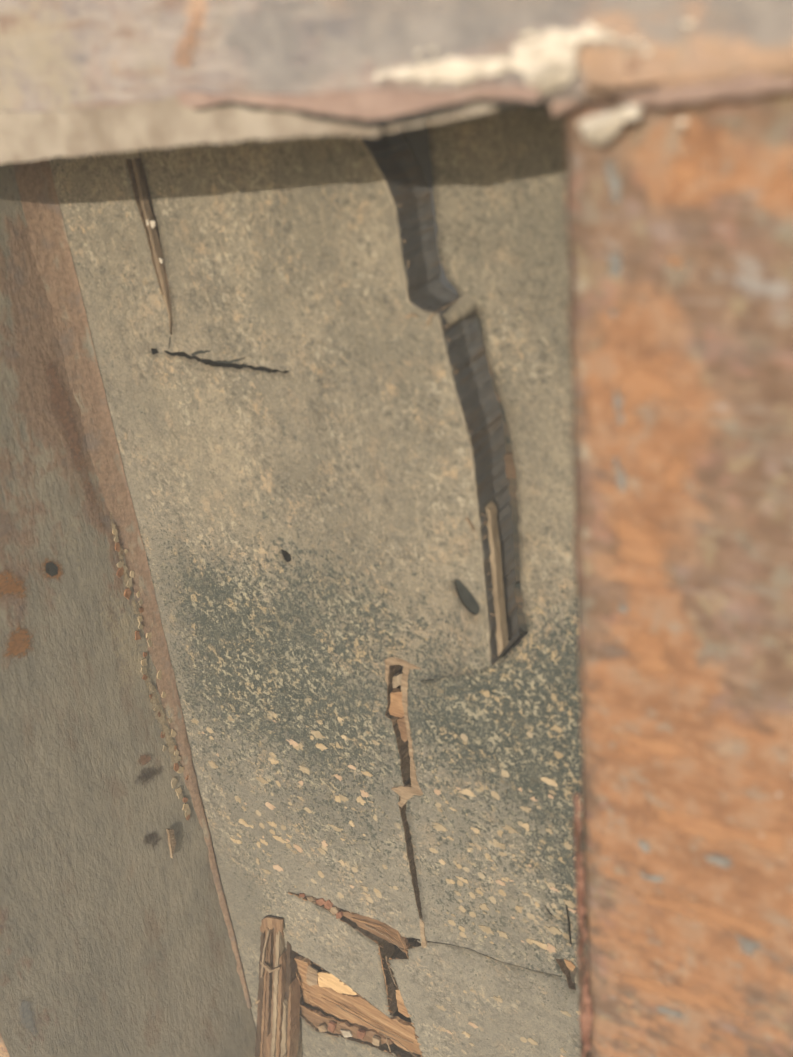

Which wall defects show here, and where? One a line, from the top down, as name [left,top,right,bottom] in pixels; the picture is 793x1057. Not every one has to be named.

crack [127,158,287,373]
crack [364,118,528,665]
peeling [287,720,328,751]
spalling [230,763,423,1057]
crack [384,657,431,949]
corrosion [572,791,593,1057]